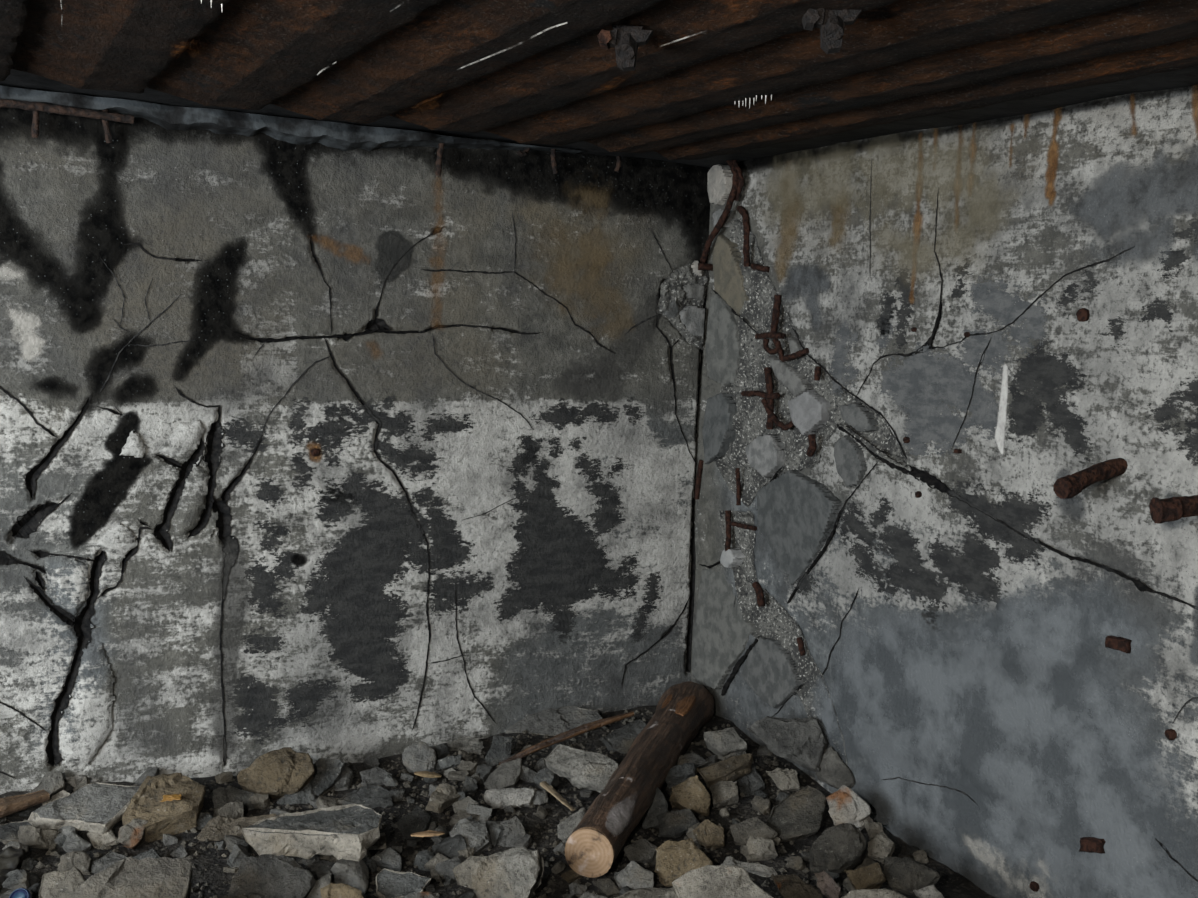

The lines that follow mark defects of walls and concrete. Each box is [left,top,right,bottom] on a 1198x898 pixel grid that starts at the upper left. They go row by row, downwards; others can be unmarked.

water stain [70,140,140,320]
water stain [677,165,710,265]
crack [866,158,874,273]
corrosion [1045,108,1061,204]
peeling [1100,218,1198,348]
water stain [36,348,156,410]
crack [0,212,759,767]
spalling [657,160,1102,767]
crack [787,190,1198,610]
corrosion [1053,458,1128,499]
corrosion [1149,495,1198,524]
water stain [815,588,1198,898]